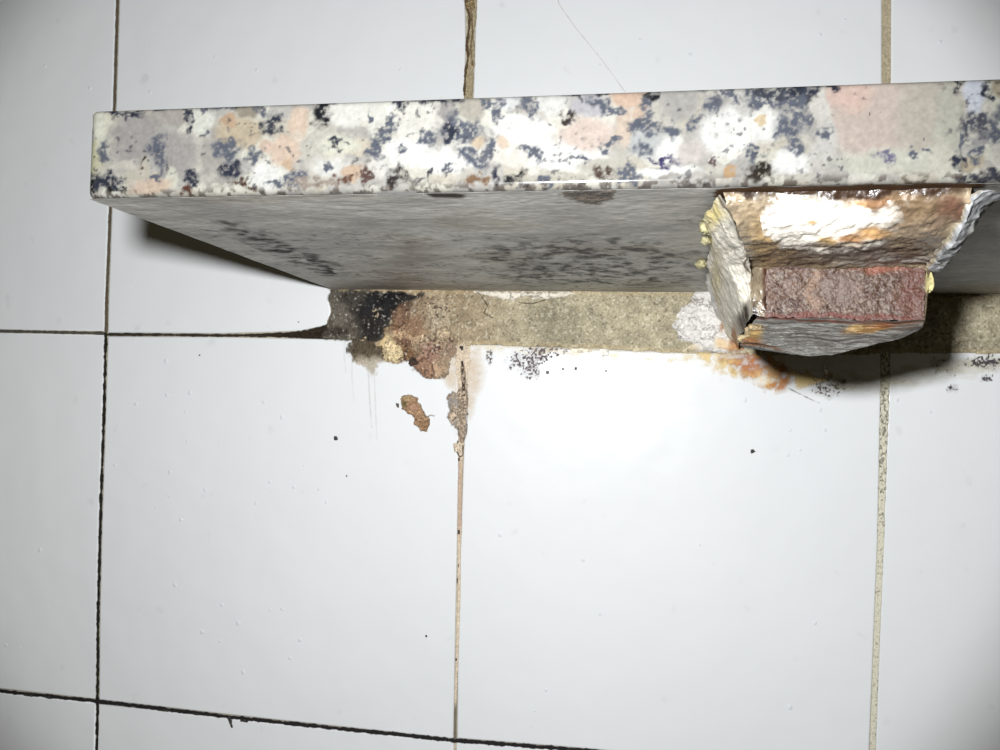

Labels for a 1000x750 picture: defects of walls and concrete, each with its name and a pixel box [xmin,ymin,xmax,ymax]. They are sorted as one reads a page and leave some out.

leakage [322,289,425,366]
peeling [672,292,925,356]
corrosion [701,352,825,390]
flaking render [396,395,431,432]